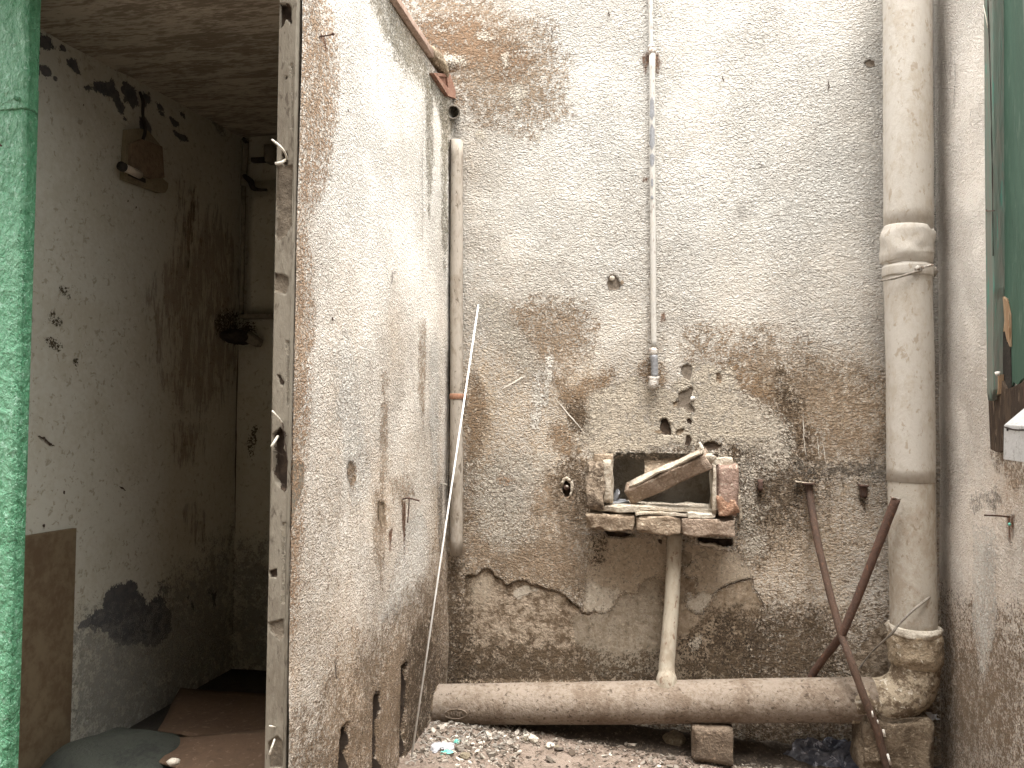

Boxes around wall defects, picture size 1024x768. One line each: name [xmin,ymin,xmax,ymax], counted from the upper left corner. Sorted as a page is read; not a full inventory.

peeling [39,32,189,142]
leakage [370,0,571,273]
peeling [274,427,291,492]
corrosion [392,475,415,541]
leakage [289,290,660,768]
leakage [615,442,703,460]
flaking render [655,364,721,450]
leakage [679,320,886,566]
flaking render [459,569,665,683]